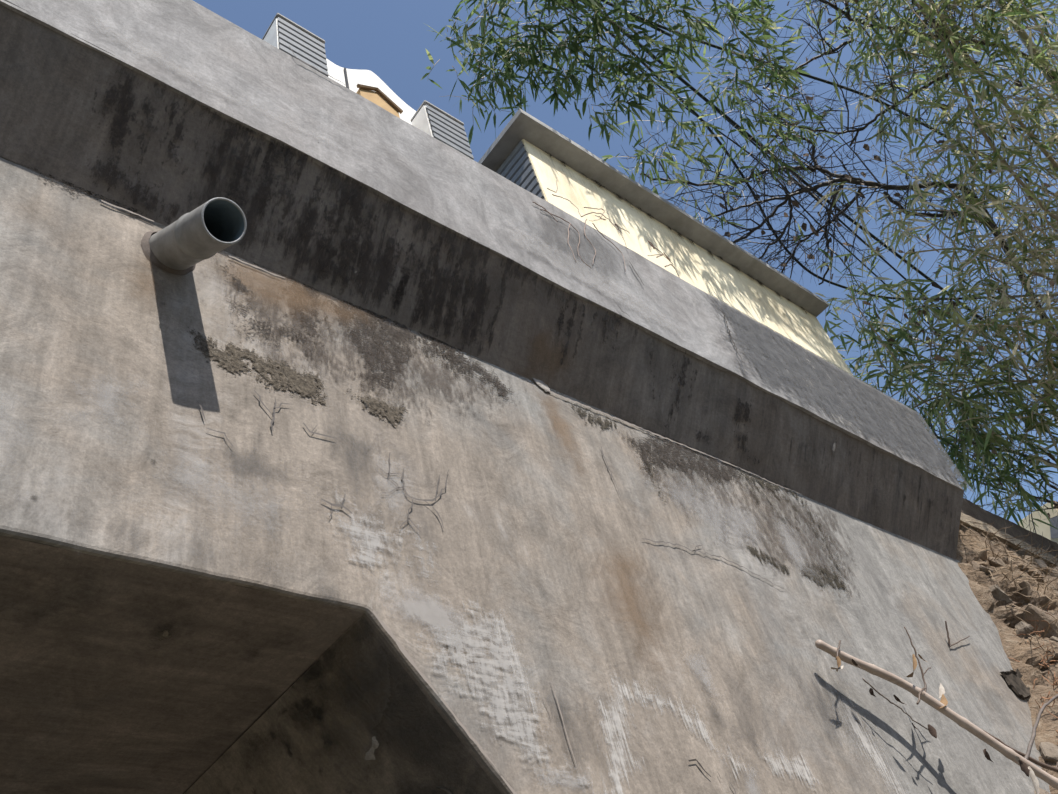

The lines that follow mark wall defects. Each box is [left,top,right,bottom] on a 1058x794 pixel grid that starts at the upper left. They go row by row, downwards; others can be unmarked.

leakage [28,71,537,408]
crack [379,453,449,533]
leakage [572,348,860,596]
crack [688,759,736,794]